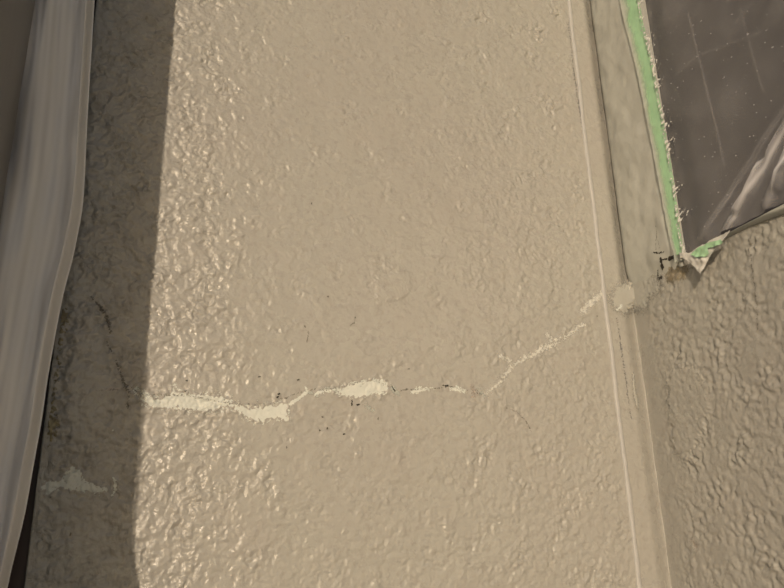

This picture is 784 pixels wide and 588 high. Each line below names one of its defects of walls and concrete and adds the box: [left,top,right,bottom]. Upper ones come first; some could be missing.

crack [473,290,603,399]
peeling [130,373,400,428]
peeling [36,459,117,503]